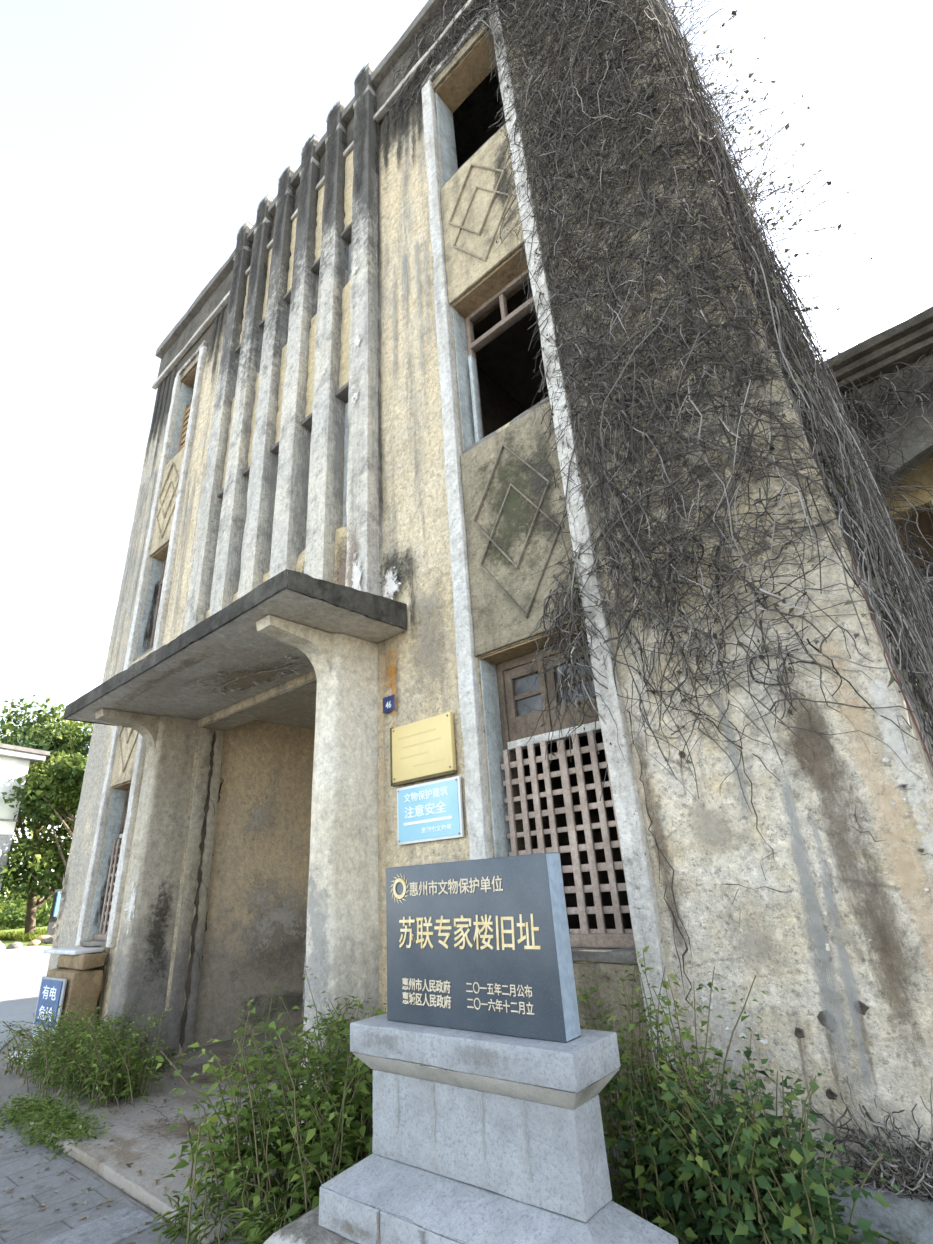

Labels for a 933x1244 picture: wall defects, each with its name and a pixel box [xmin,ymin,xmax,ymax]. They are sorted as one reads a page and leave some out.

crack [179,730,224,1047]
water stain [780,677,923,1092]